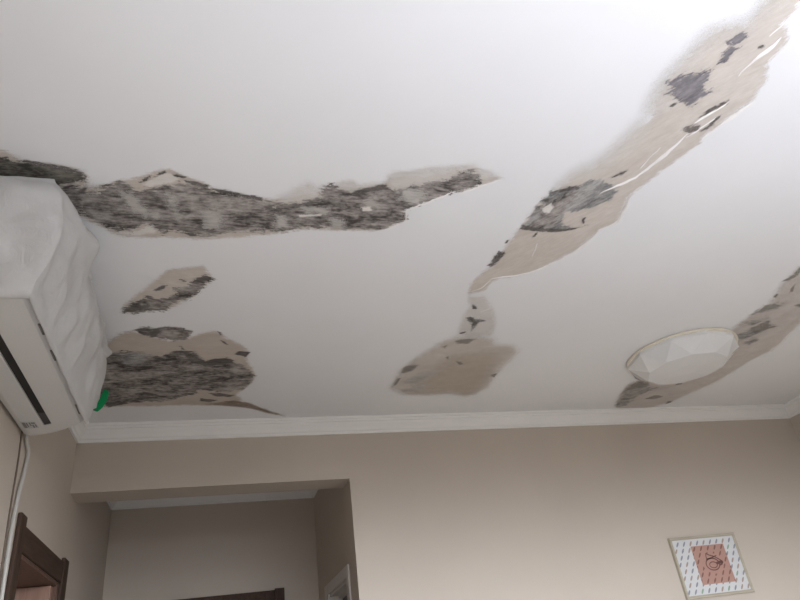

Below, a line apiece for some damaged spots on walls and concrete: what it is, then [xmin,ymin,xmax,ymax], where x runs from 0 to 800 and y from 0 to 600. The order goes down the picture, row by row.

peeling [0,149,503,240]
peeling [386,0,800,408]
peeling [121,265,217,315]
peeling [100,326,286,417]